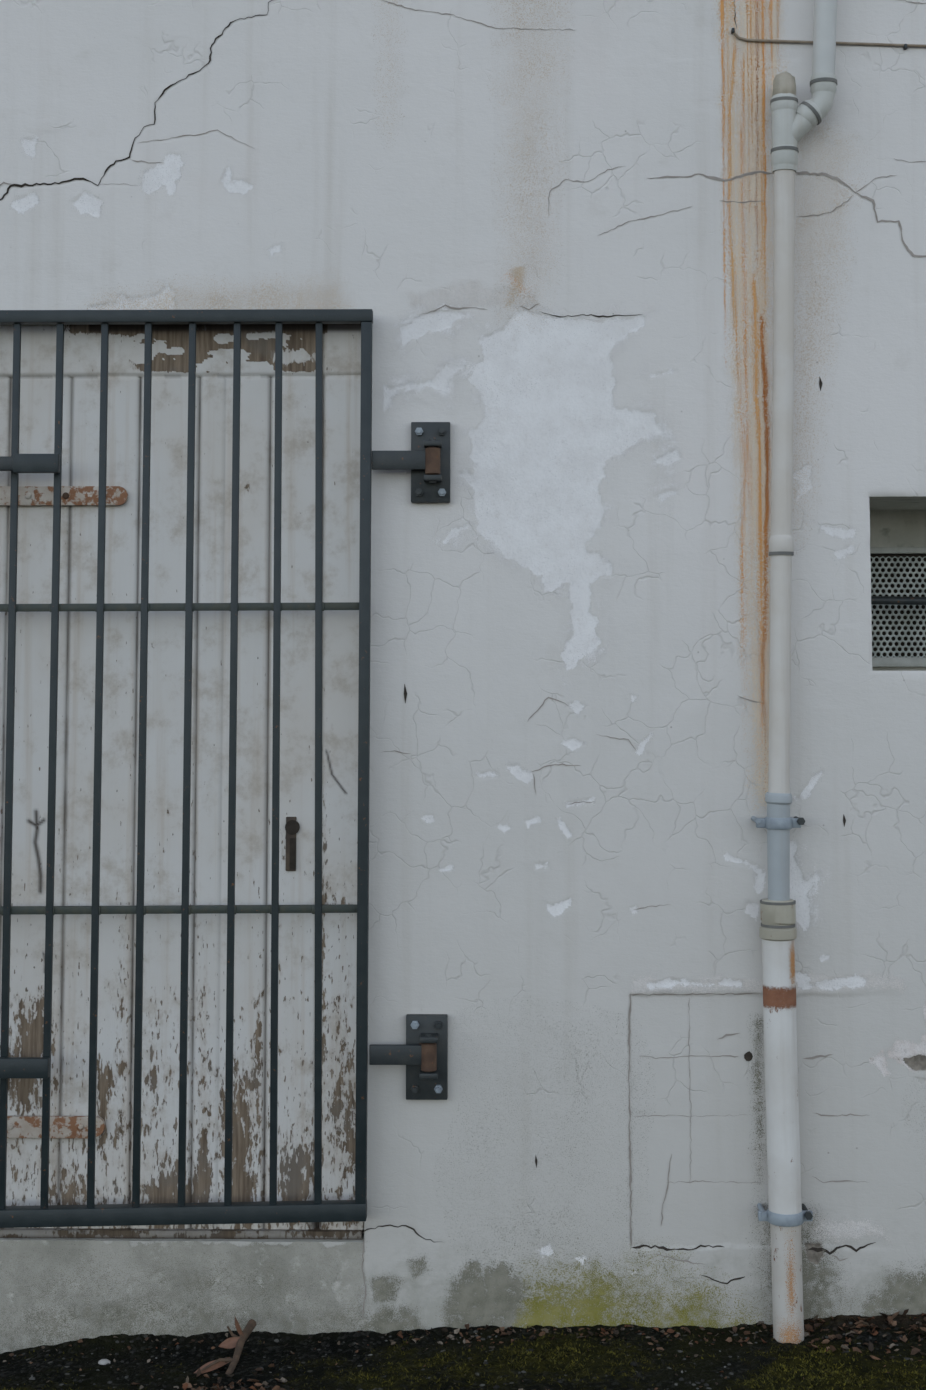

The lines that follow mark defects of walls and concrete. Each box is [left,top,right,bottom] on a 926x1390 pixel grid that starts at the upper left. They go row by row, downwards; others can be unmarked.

crack [382,0,572,31]
crack [0,0,272,200]
crack [548,159,926,257]
peeling [88,284,176,310]
crack [521,304,643,317]
corrosion [712,0,789,817]
peeling [646,977,744,991]
corrosion [763,942,796,1011]
spalling [903,1055,926,1071]
crack [628,993,762,1284]
water stain [0,996,694,1354]
crack [808,1242,876,1262]